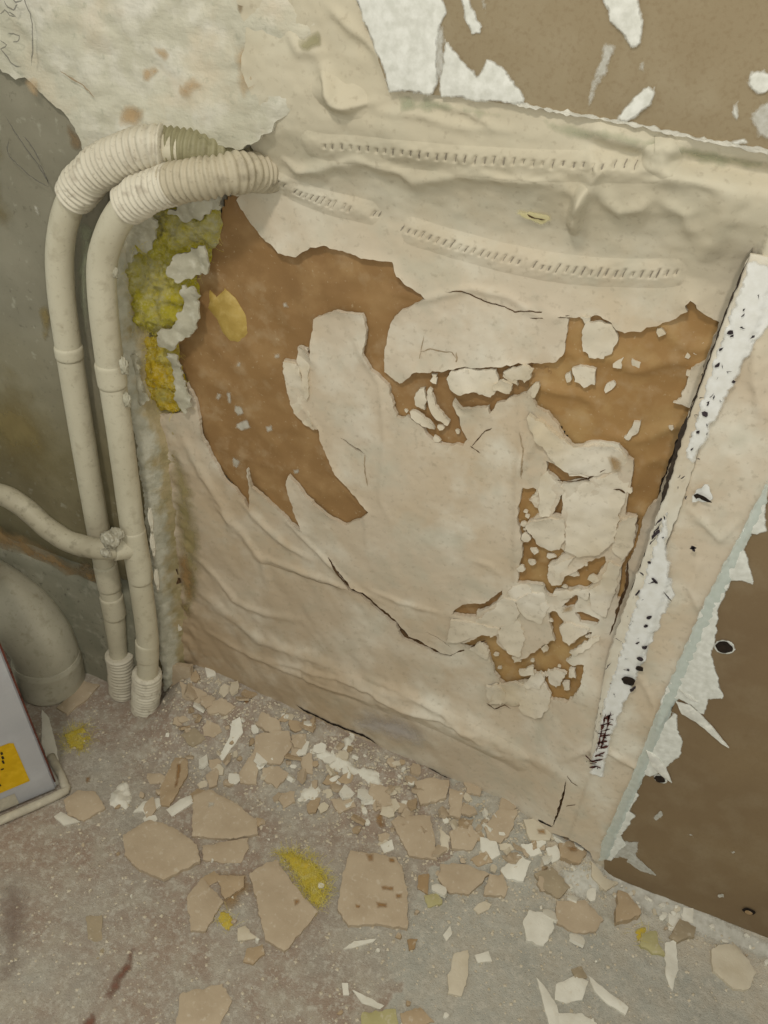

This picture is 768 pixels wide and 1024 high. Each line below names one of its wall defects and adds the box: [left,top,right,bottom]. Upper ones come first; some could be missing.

crack [451,291,570,319]
flaking render [117,240,187,692]
damp [176,463,196,610]
crack [259,558,486,653]
flaking render [179,195,719,719]
crack [538,776,577,827]